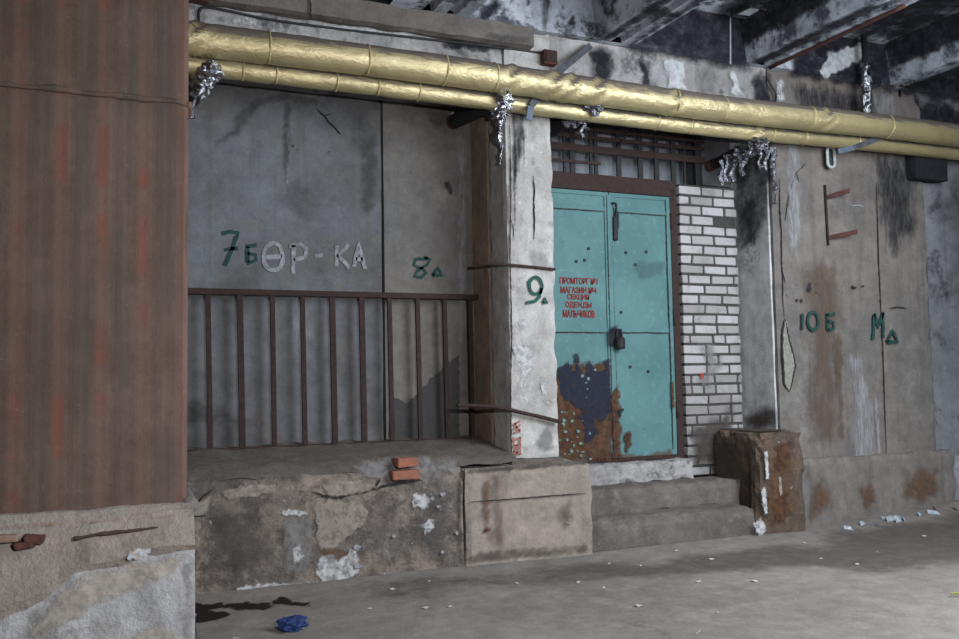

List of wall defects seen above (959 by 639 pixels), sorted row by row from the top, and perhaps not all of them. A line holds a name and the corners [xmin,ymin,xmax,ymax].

spalling [781,319,796,392]
peeling [557,354,612,460]
corrosion [556,362,637,462]
crack [313,478,421,501]
spalling [282,456,455,581]
corrosion [769,442,793,521]